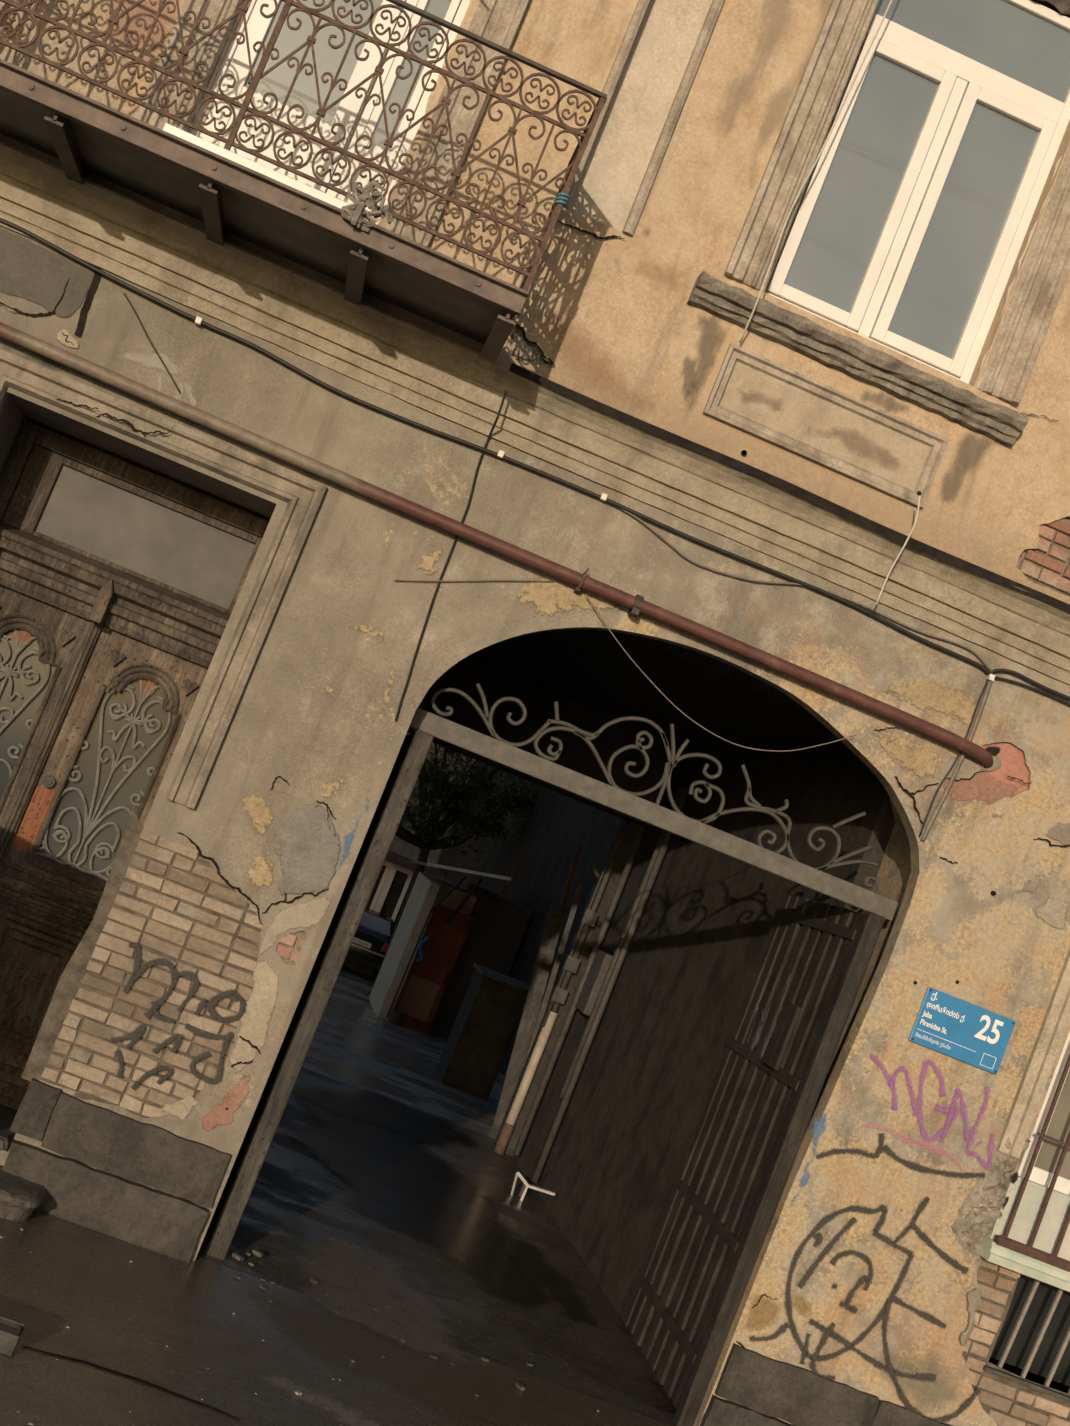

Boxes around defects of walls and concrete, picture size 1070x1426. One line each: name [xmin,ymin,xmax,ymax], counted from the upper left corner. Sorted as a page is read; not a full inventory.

flaking render [1016,517,1070,597]
peeling [239,793,275,836]
flaking render [880,735,1032,818]
flaking render [21,810,330,1131]